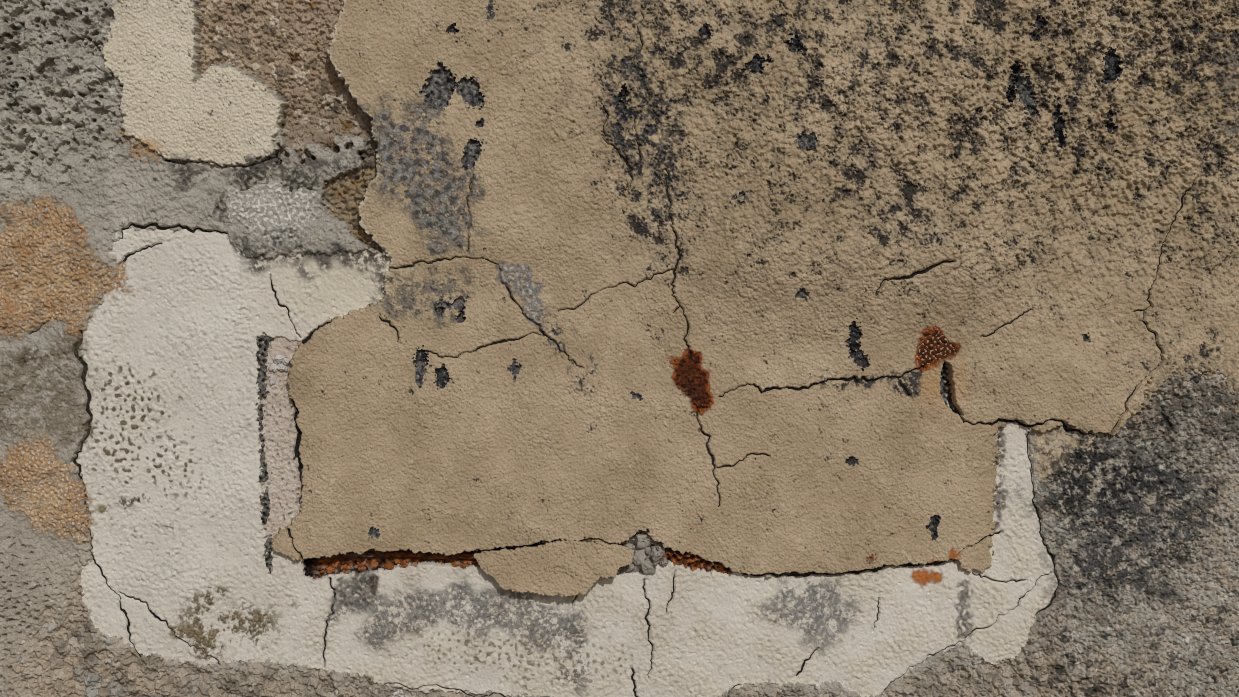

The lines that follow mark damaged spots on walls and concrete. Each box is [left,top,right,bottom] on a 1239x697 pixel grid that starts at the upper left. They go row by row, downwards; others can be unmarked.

mould [603,6,680,216]
flaking render [1004,60,1068,148]
crack [379,107,691,368]
peeling [70,0,1058,697]
corrosion [670,349,714,414]
crack [696,368,920,507]
corrosion [915,326,960,371]
crack [875,139,1212,691]
water stain [1160,381,1239,436]
corrosion [303,542,544,579]
corrosion [665,548,732,576]
water stain [1046,434,1215,592]